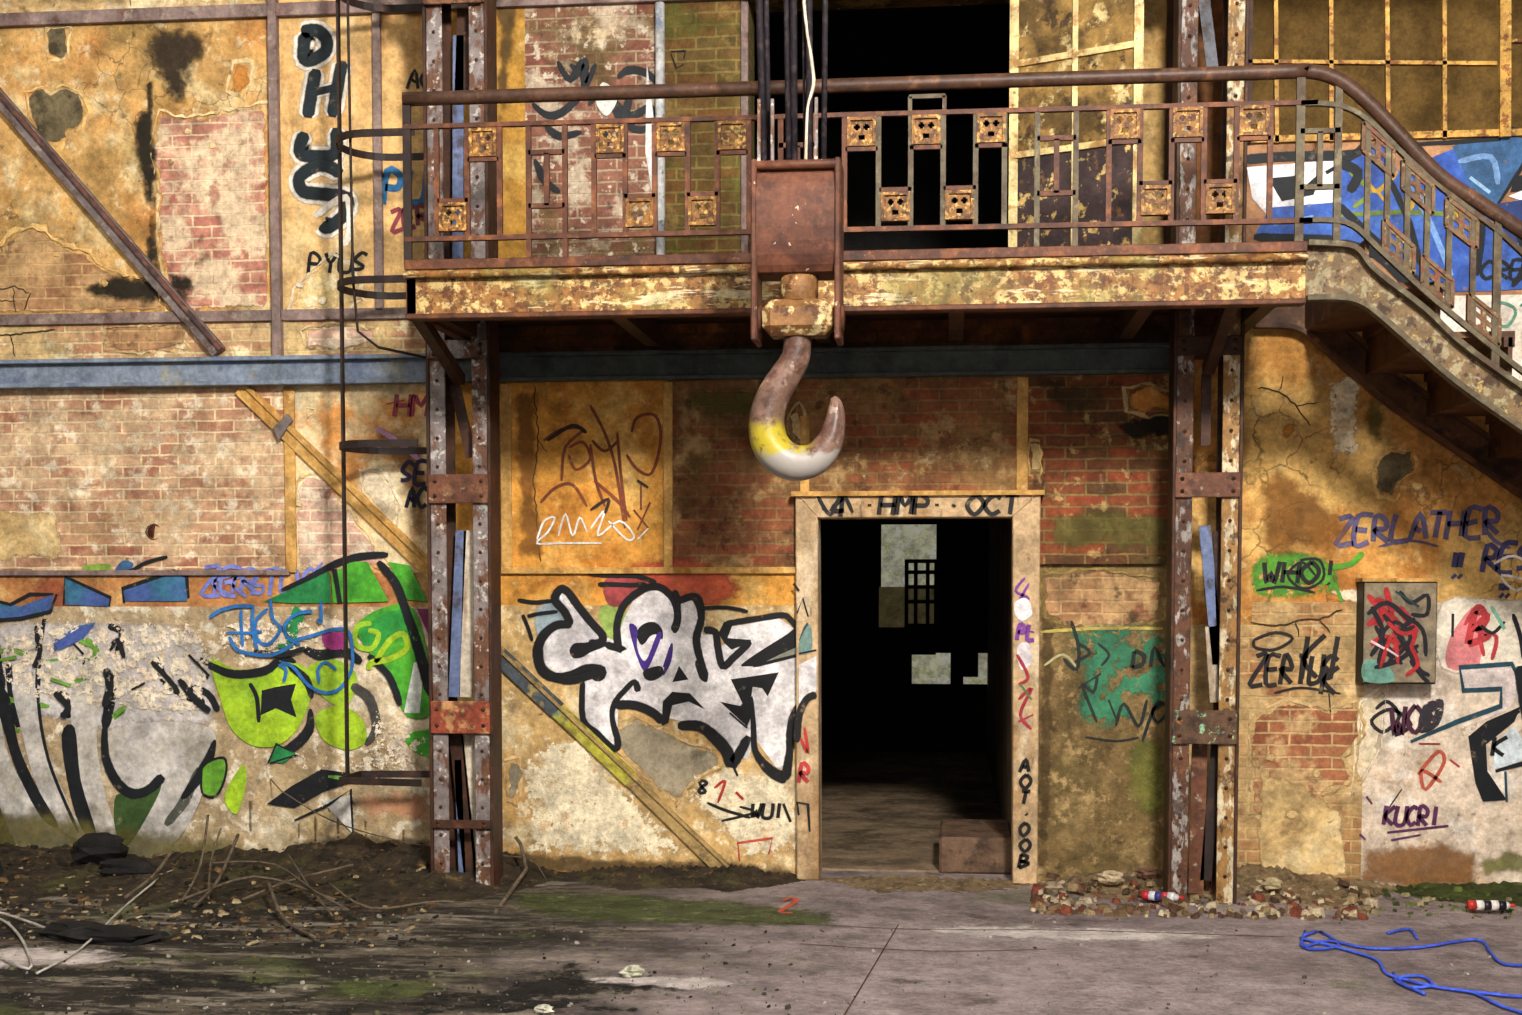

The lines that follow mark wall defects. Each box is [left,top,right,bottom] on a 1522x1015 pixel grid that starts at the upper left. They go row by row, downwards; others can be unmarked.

water stain [86,29,204,302]
flaking render [0,57,380,358]
crack [1258,377,1318,426]
flaking render [1247,684,1389,823]